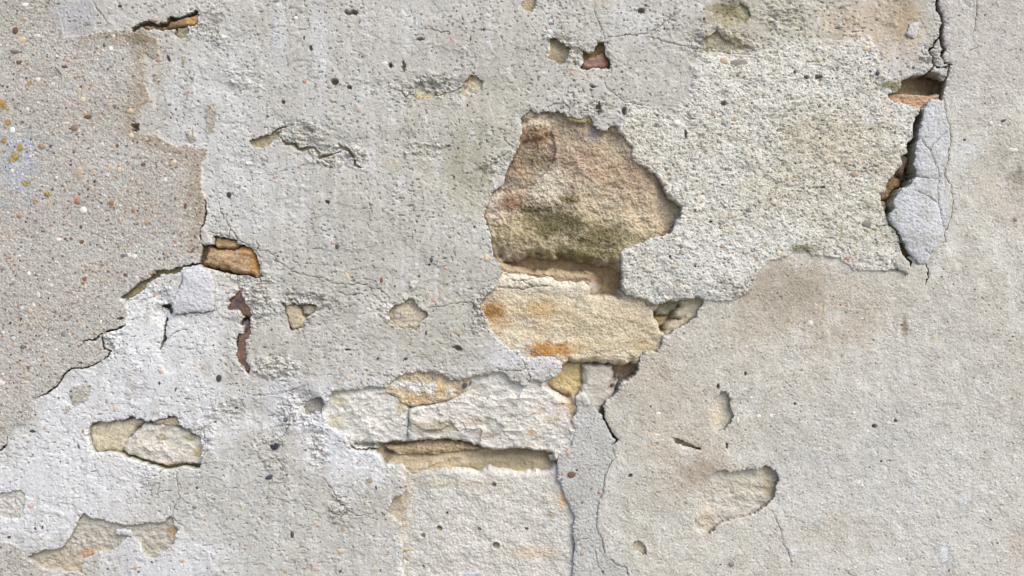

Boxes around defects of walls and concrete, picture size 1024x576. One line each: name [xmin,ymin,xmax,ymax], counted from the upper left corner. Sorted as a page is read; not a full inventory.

spalling [131,10,199,38]
spalling [548,37,611,70]
peeling [879,66,951,275]
crack [888,0,978,285]
crack [35,324,126,400]
spalling [200,225,263,374]
crack [171,200,388,336]
spalling [304,101,704,576]
peeling [27,513,179,574]
spalling [76,416,202,470]
crack [557,404,628,576]
peeling [694,465,779,534]